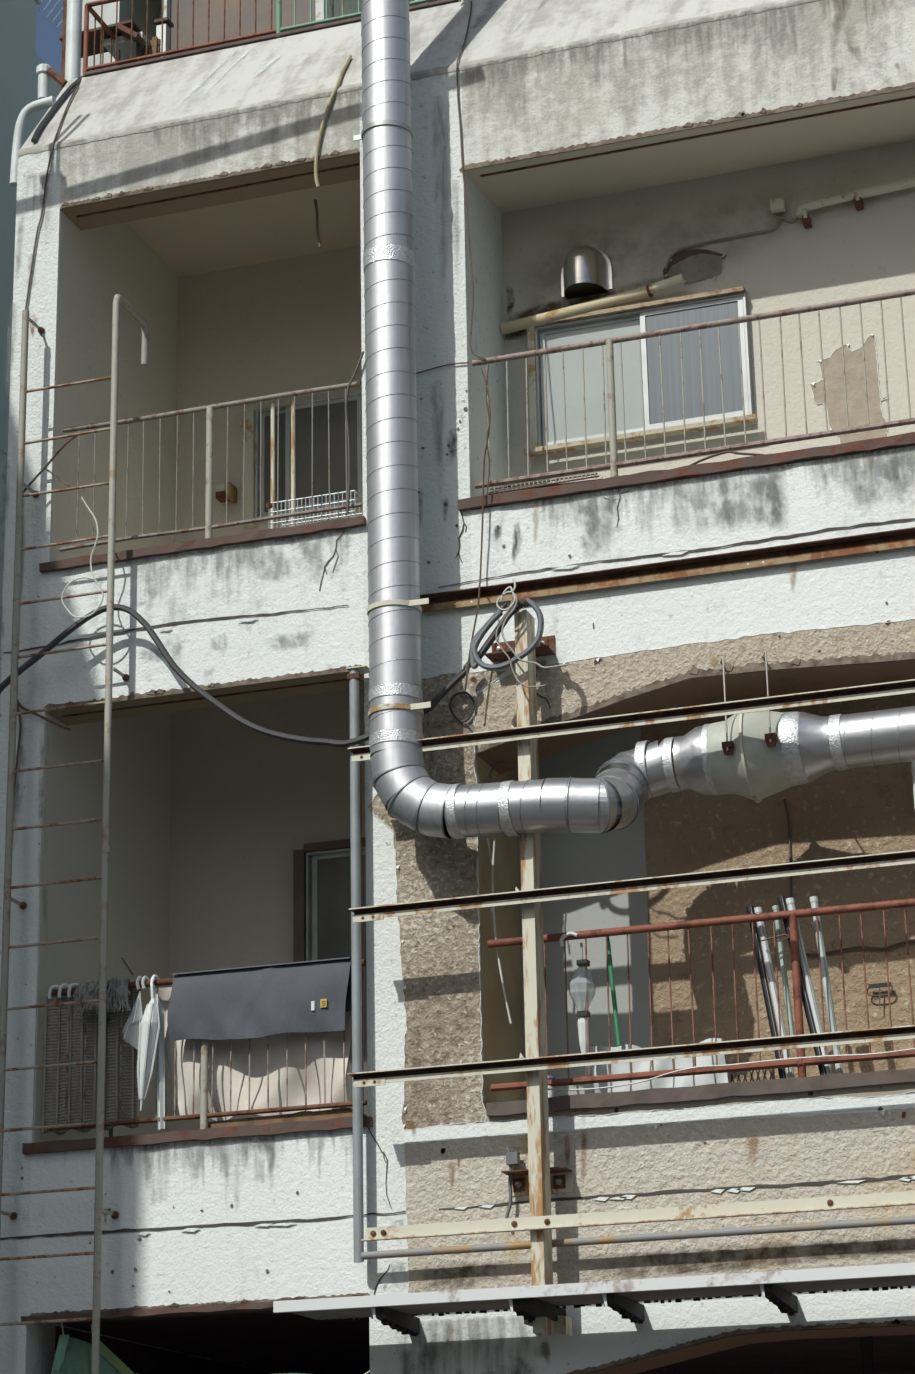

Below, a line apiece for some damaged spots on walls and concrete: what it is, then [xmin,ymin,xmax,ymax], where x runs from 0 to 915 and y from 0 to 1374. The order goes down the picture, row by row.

peeling [809,334,888,444]